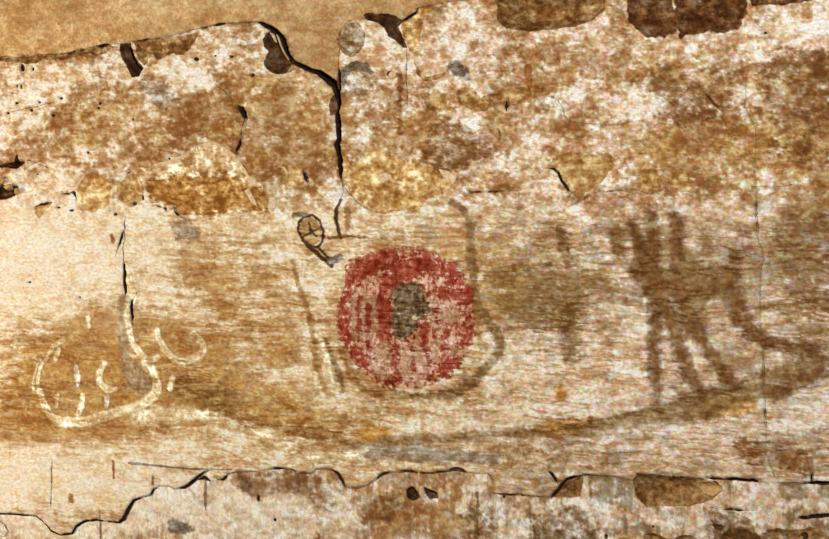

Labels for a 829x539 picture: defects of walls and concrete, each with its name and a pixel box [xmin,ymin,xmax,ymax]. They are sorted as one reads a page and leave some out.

flaking render [495,0,605,32]
flaking render [627,0,811,39]
hole [263,31,295,74]
crack [14,21,416,225]
flaking render [0,155,25,200]
crack [751,156,792,330]
crack [0,464,599,537]
flaking render [633,473,723,507]
flaking render [643,526,666,539]
flaking render [713,524,829,539]